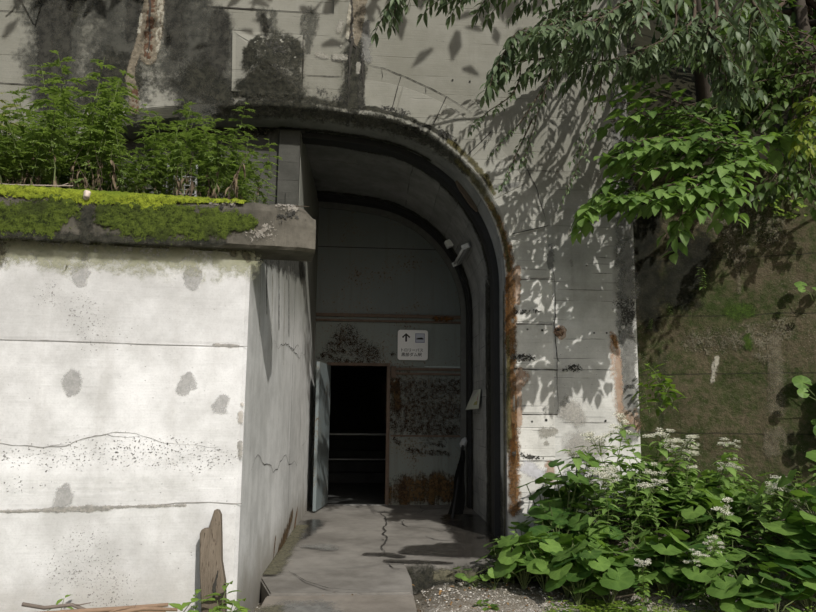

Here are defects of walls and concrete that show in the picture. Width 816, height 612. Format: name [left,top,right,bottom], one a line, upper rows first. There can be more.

leakage [18,0,318,143]
leakage [300,6,328,59]
leakage [339,20,371,113]
leakage [610,86,636,195]
leakage [0,221,306,290]
leakage [363,165,529,581]
rust [487,203,522,517]
rust [610,332,641,431]
leakage [612,203,720,443]
leakage [293,519,324,539]
crack [380,510,450,569]
rust [384,471,455,505]